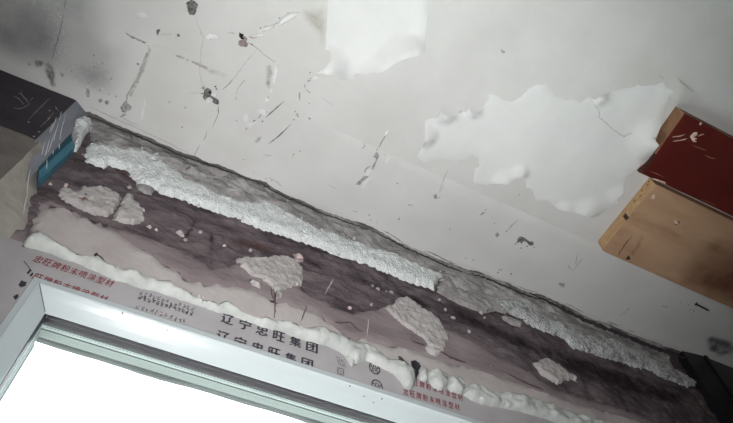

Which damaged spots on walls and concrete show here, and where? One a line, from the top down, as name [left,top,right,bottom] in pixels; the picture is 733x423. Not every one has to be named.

peeling [299,0,427,99]
crack [83,21,685,359]
peeling [417,82,674,218]